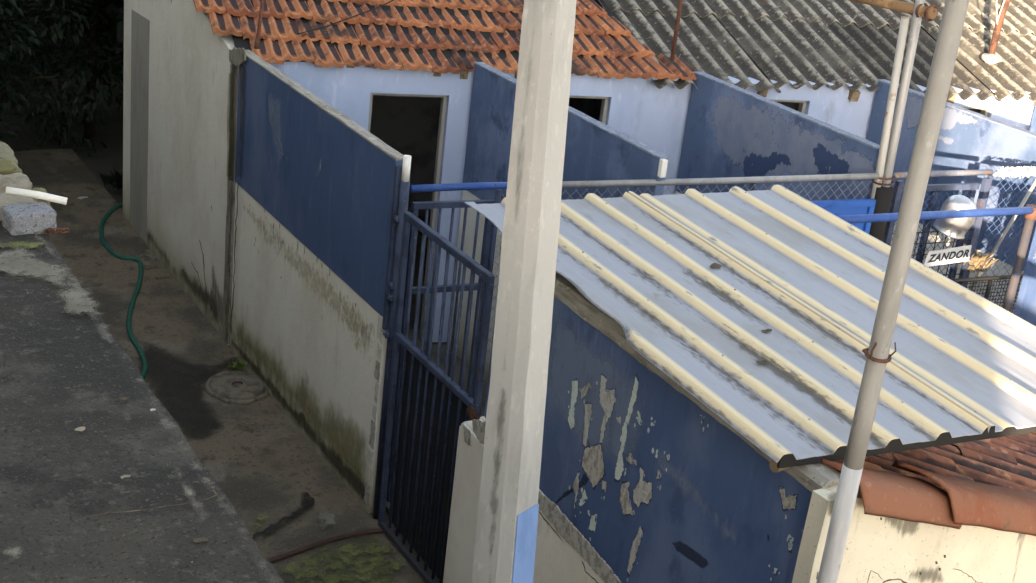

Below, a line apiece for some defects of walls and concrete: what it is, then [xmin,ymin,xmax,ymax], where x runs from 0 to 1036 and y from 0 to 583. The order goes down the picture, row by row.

leakage [183,270,231,331]
peeling [538,373,670,583]
peeling [779,486,798,519]
crack [867,570,907,583]